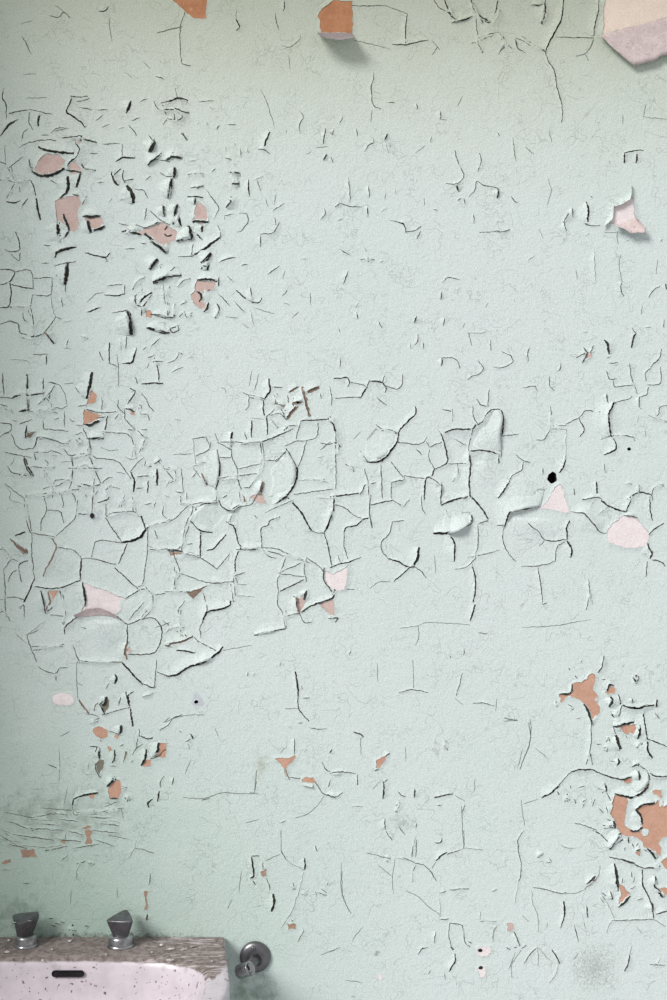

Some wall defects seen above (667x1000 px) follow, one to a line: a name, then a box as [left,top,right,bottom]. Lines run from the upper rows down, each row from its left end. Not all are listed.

crack [98,5,112,39]
peeling [168,0,211,23]
peeling [314,0,357,40]
peeling [597,0,667,65]
crack [146,64,165,82]
peeling [32,152,85,176]
peeling [604,185,646,234]
crack [0,88,667,879]
crack [228,655,667,984]
peeling [604,771,667,899]
crack [146,873,154,885]
crack [48,896,90,936]